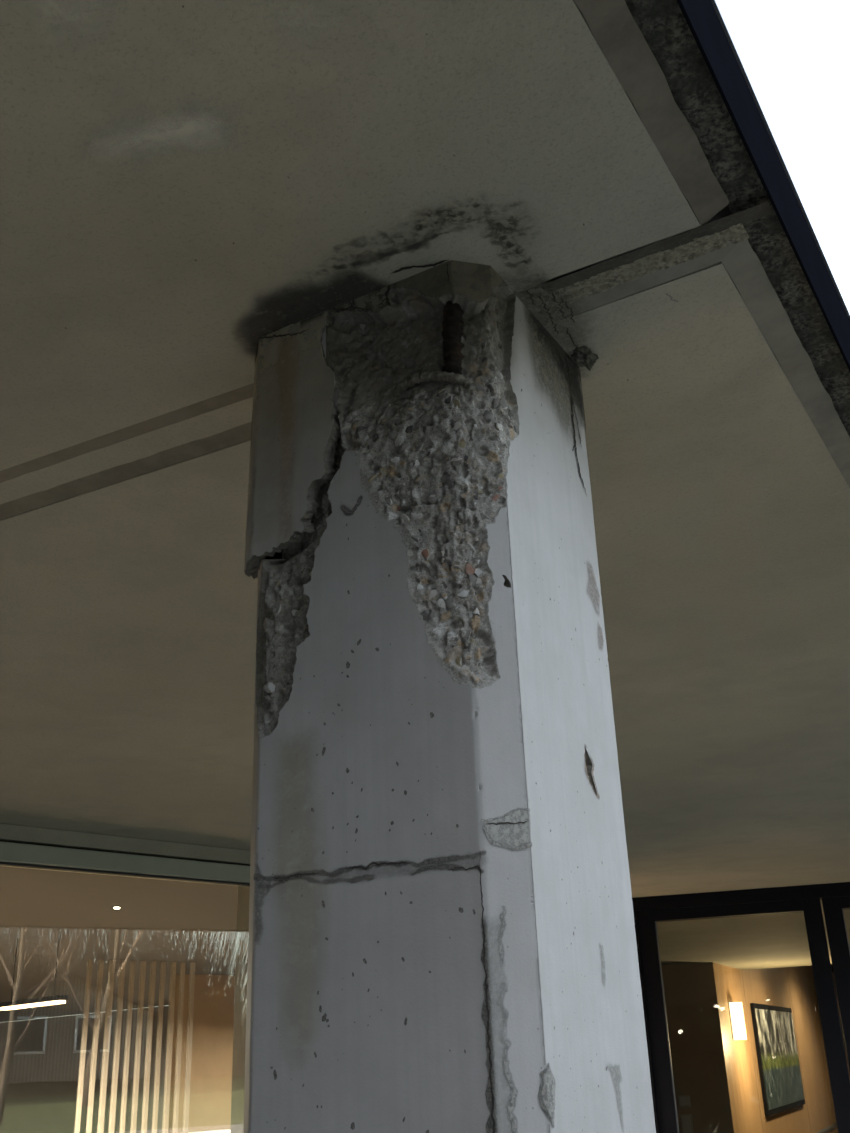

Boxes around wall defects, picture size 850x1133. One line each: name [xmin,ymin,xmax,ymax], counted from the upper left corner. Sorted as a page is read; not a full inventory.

water stain [241,204,527,362]
crack [562,347,587,495]
crack [341,496,362,515]
spalling [256,284,525,740]
peeling [481,808,532,851]
crack [504,479,546,1065]
crack [254,851,518,1133]
peeling [538,1063,555,1128]